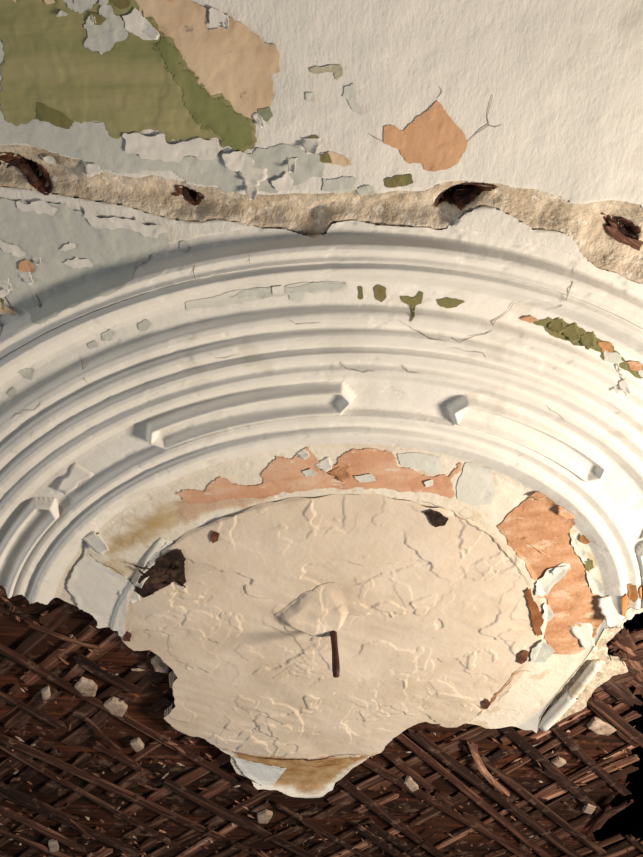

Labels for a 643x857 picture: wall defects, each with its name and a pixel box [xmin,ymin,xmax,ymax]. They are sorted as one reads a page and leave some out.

peeling [0,0,643,325]
peeling [88,329,116,349]
peeling [520,316,643,396]
peeling [177,447,462,521]
spalling [424,510,448,527]
peeling [67,530,186,637]
peeling [497,491,643,733]
peeling [233,757,287,787]
damp [228,749,367,792]